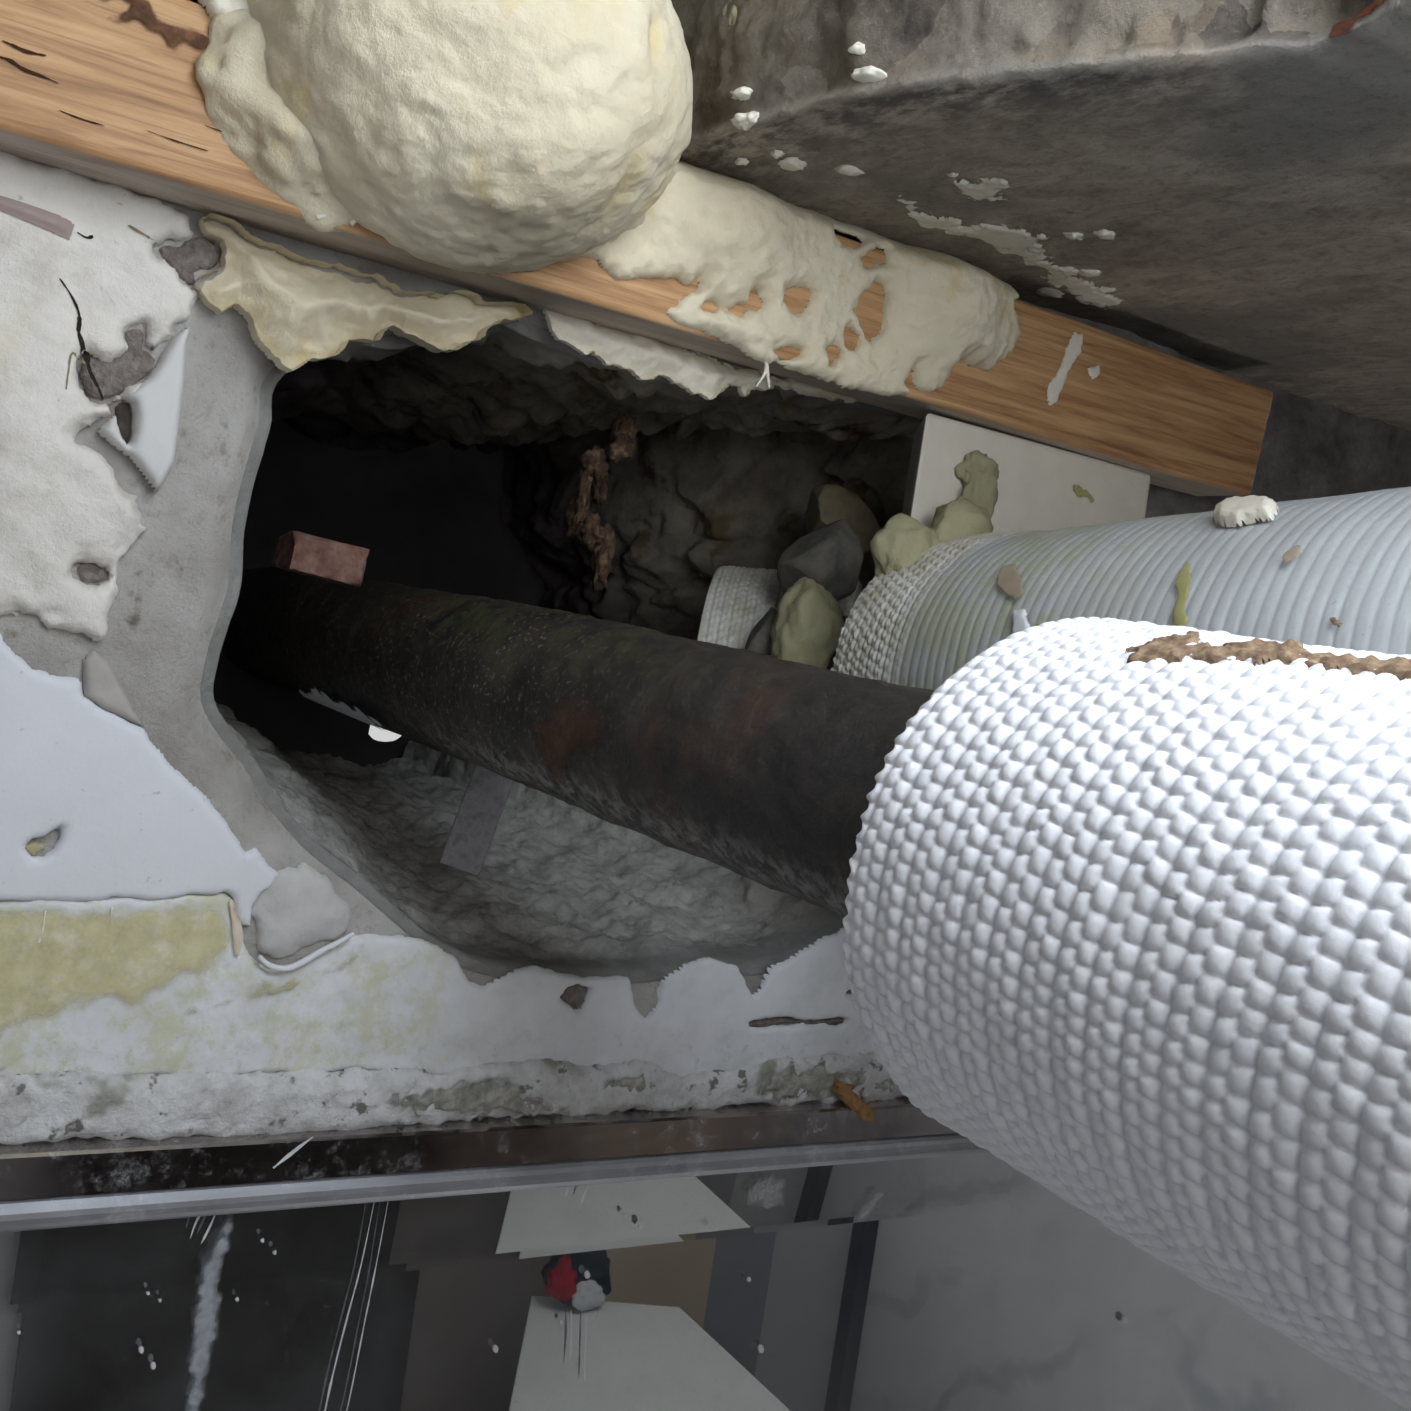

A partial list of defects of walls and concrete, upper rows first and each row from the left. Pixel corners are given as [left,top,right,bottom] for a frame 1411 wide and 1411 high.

corrosion [1328,0,1384,37]
crack [59,278,103,400]
peeling [0,151,874,1077]
damp [0,899,243,1030]